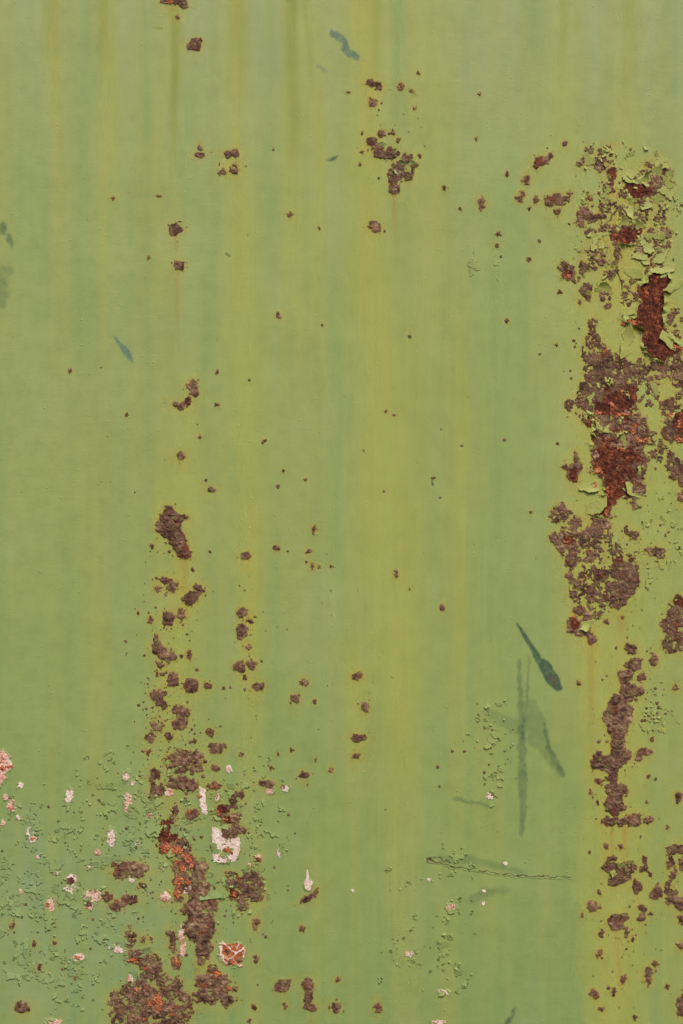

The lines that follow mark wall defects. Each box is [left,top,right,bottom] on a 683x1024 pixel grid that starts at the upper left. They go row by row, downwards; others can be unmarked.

corrosion [357,78,425,194]
peeling [574,142,682,297]
corrosion [514,141,683,1016]
peeling [0,748,316,1024]
corrosion [87,503,273,1024]